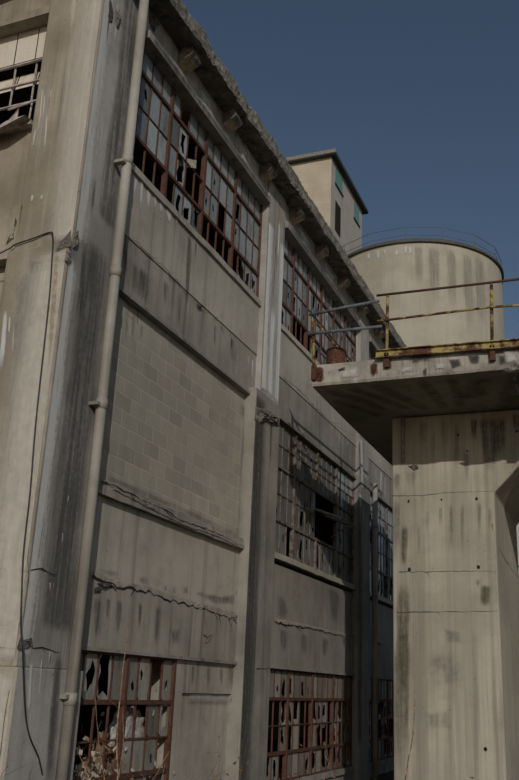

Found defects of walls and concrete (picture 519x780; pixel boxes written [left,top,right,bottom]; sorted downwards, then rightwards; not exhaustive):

leakage [0,0,134,657]
crack [102,481,245,548]
crack [92,571,238,625]
crack [275,618,354,639]
leakage [27,652,61,768]